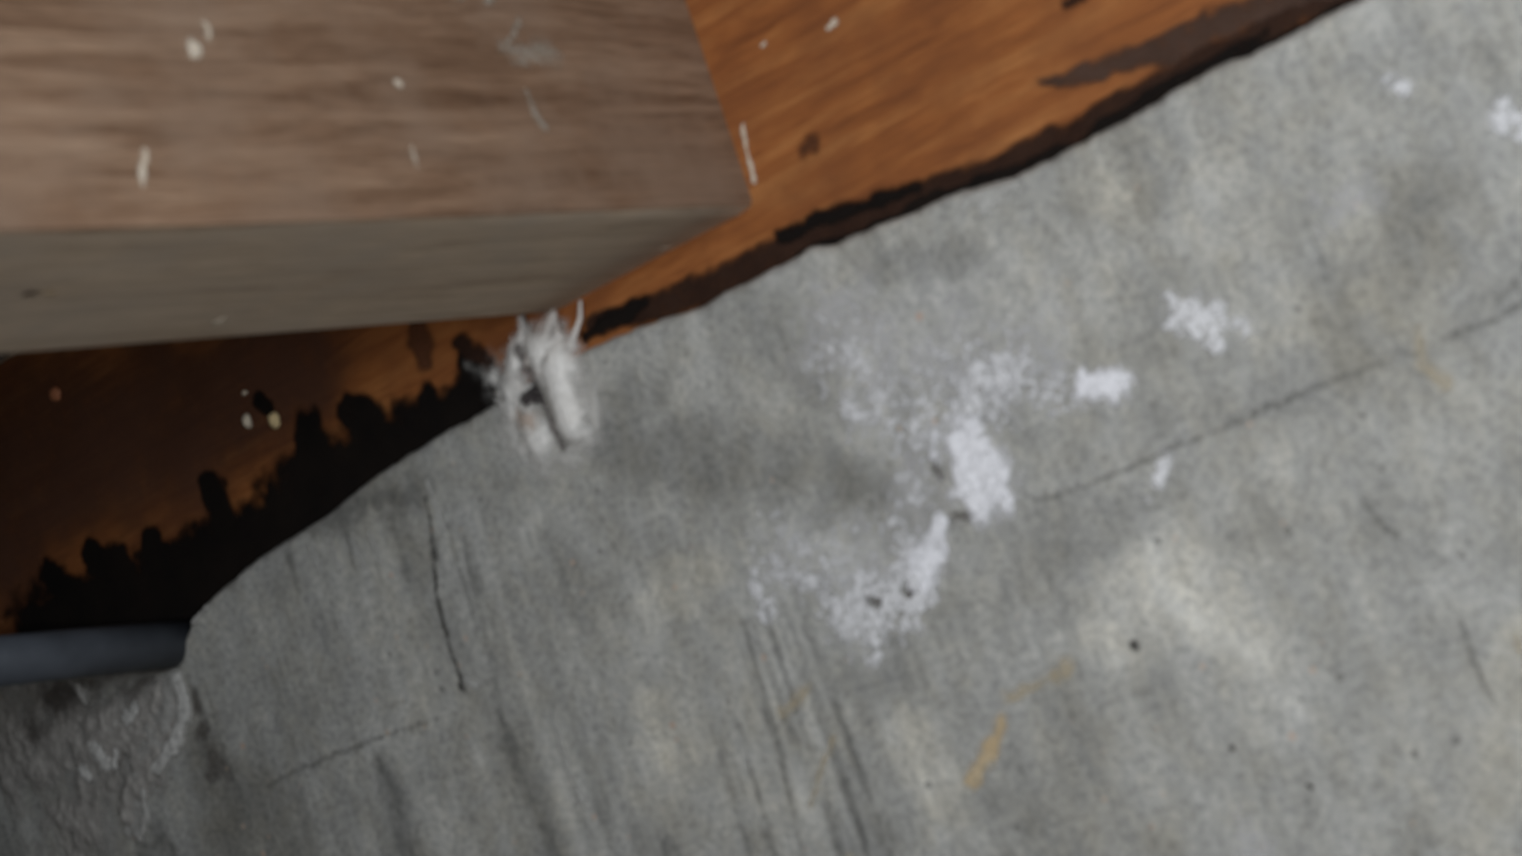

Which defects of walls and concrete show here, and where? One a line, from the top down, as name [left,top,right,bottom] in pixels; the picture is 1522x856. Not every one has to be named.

damp [1383,76,1411,97]
damp [1490,97,1522,142]
damp [747,309,1132,668]
damp [1148,453,1171,502]
crack [424,480,480,691]